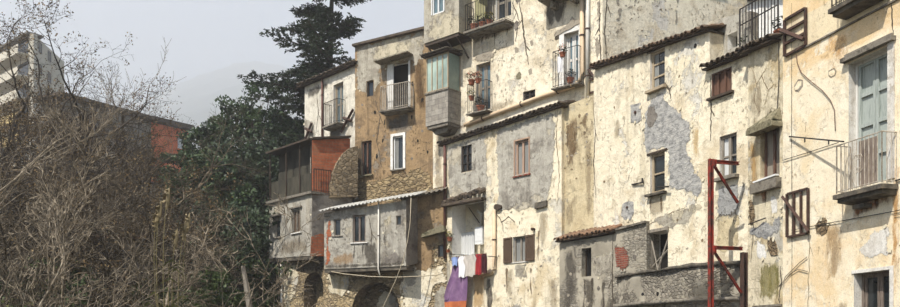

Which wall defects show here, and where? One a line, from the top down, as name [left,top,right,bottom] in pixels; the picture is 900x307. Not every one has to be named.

crack [512,2,530,65]
spalling [639,92,704,200]
damp [828,229,838,274]